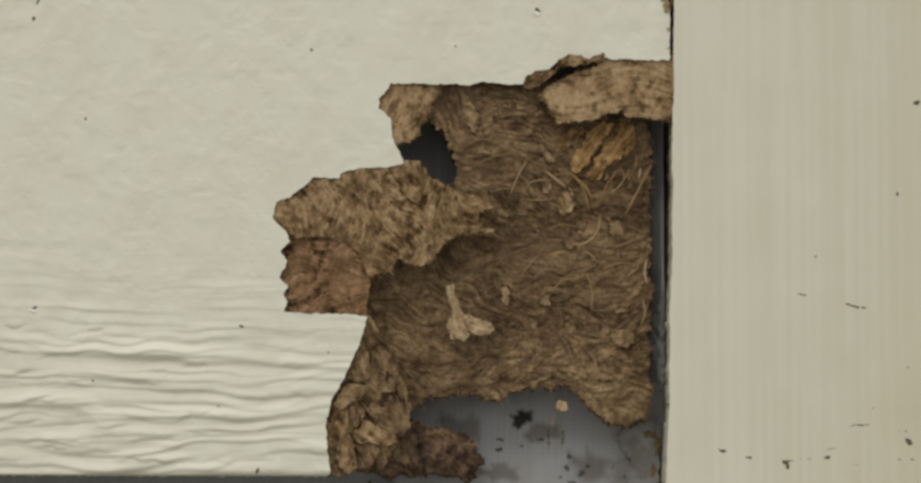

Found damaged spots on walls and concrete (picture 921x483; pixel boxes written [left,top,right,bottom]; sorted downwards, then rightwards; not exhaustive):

peeling [523,53,606,89]
peeling [461,100,482,132]
peeling [570,121,635,181]
peeling [557,188,577,215]
peeling [609,220,626,236]
peeling [501,286,510,306]
peeling [611,329,635,348]
peeling [333,340,399,474]
peeling [556,400,568,411]